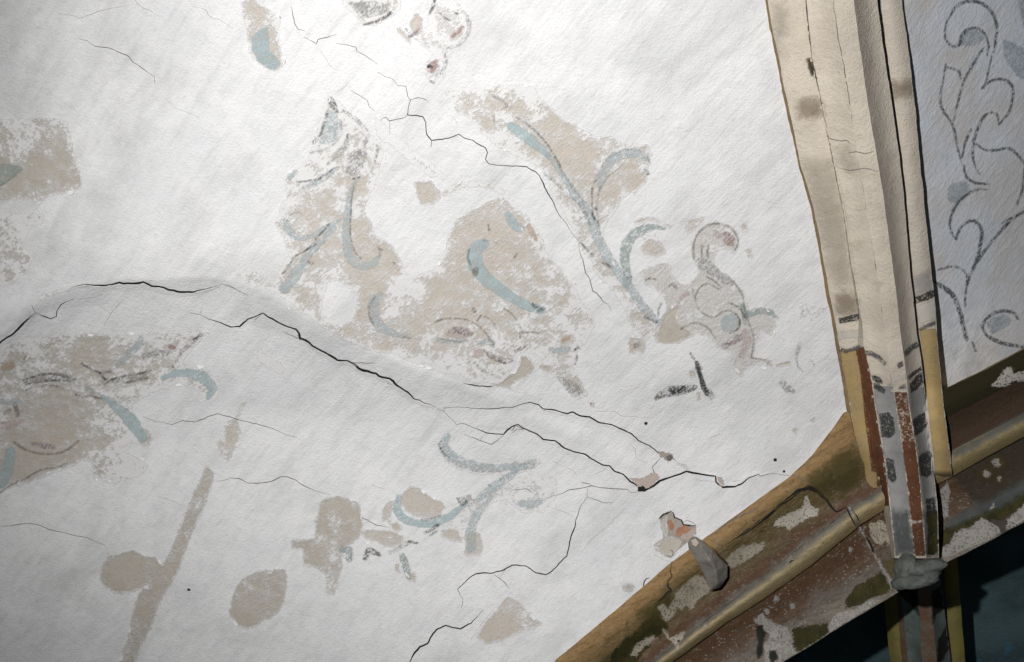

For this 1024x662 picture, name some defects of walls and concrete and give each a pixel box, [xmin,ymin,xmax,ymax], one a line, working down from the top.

crack [291,8,611,310]
crack [0,281,860,662]
flaking render [654,511,696,558]